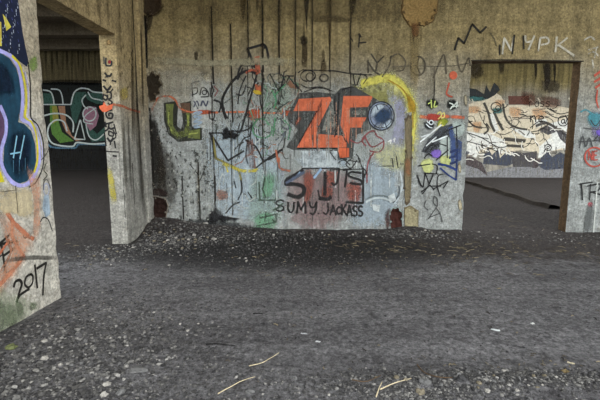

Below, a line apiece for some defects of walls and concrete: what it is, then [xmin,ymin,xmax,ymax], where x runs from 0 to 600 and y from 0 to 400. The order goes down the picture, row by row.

spalling [400,0,439,36]
water stain [135,14,177,202]
peeling [153,149,215,221]
spalling [365,114,419,228]